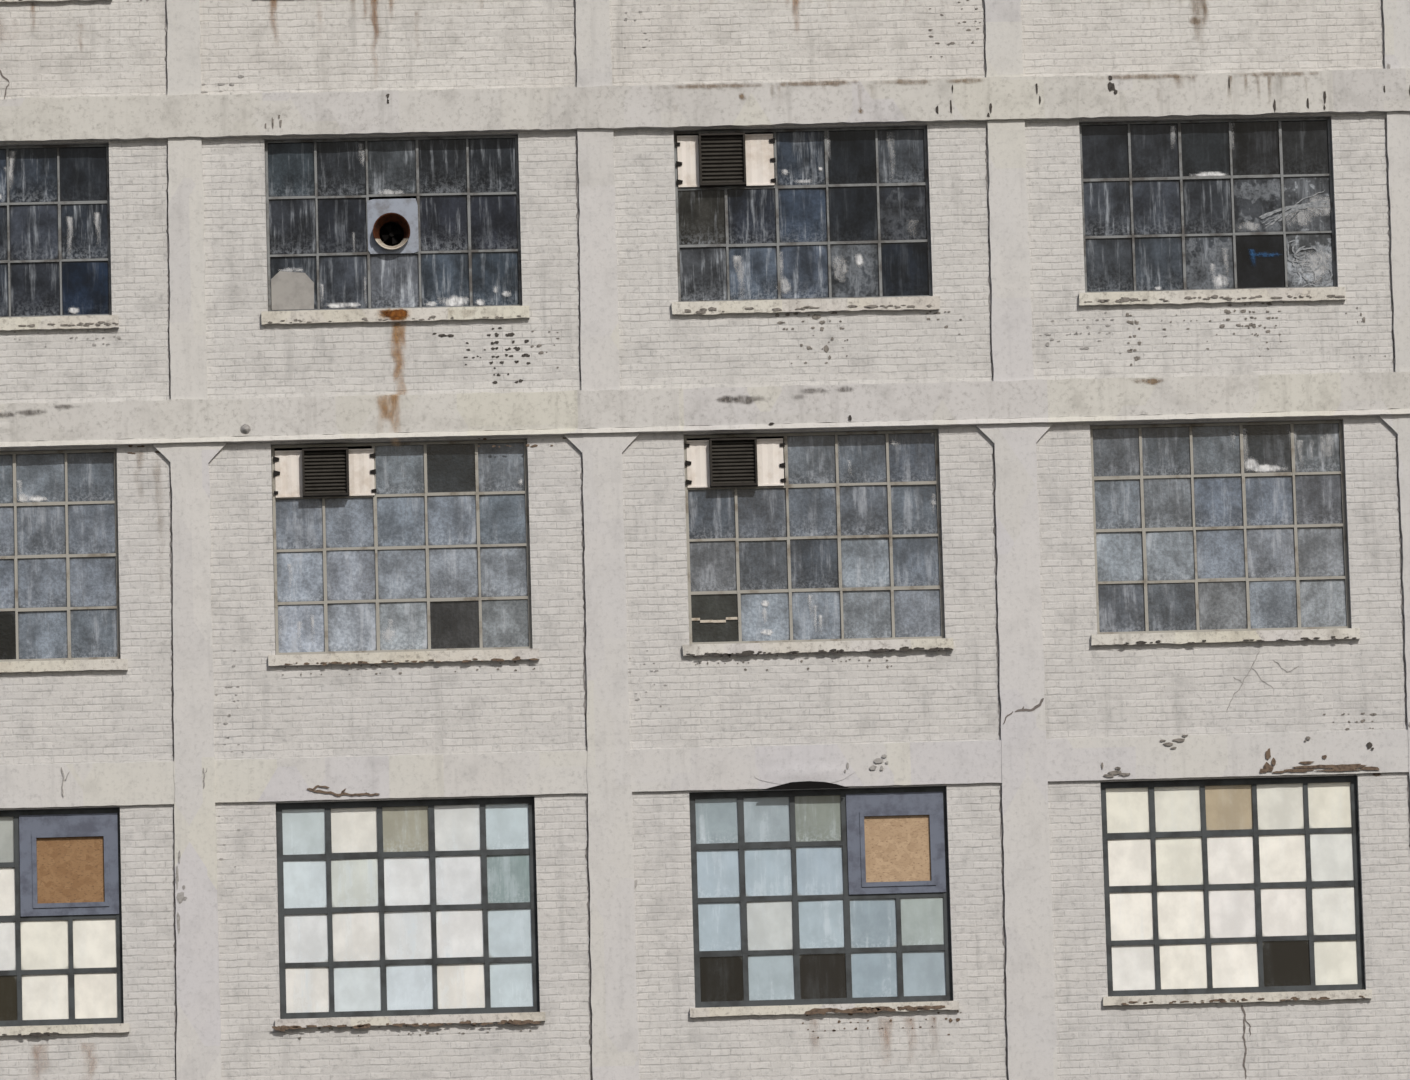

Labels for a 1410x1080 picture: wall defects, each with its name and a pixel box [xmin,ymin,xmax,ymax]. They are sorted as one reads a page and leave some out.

crack [980,0,988,72]
crack [985,126,993,378]
corrosion [383,309,407,374]
peeling [412,315,560,384]
crack [992,445,1044,736]
crack [1227,651,1299,710]
spalling [1260,712,1381,776]
crack [999,786,1009,1080]
crack [1241,1005,1251,1079]